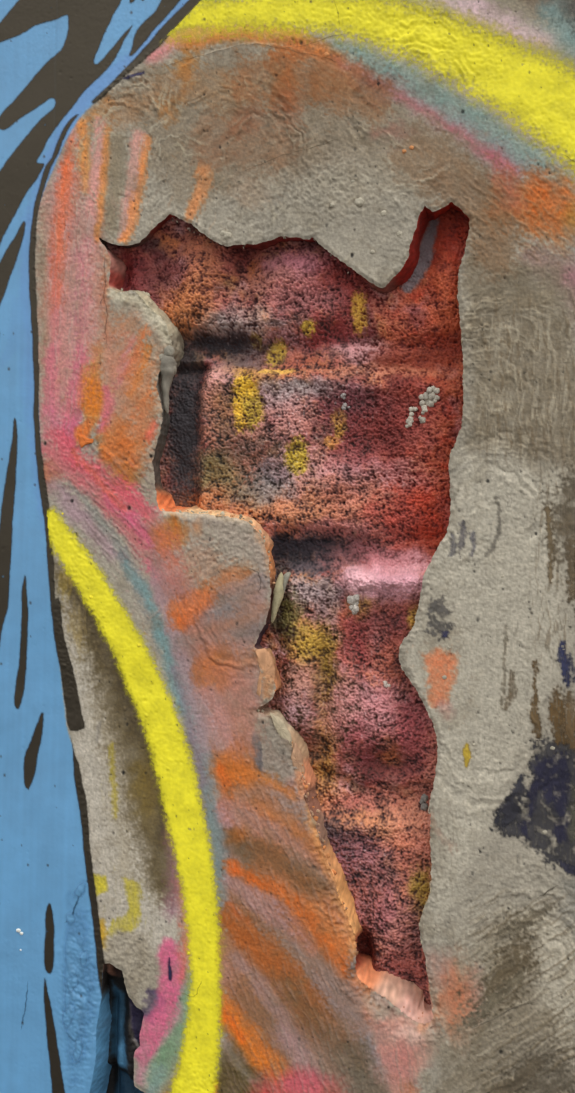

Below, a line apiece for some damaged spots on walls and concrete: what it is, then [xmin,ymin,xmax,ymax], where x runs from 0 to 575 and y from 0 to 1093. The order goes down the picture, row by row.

spalling [99,202,501,1025]
spalling [90,963,144,1093]